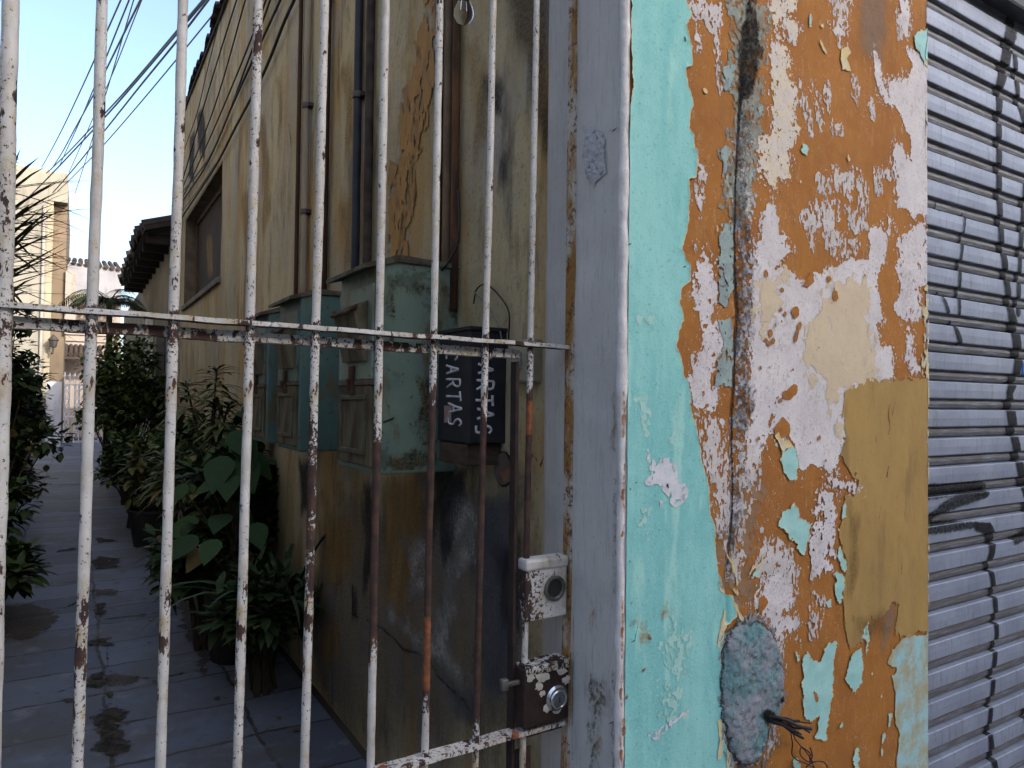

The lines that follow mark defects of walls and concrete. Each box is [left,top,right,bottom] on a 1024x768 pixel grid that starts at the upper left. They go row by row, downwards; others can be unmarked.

leakage [298,459,308,514]
leakage [316,466,523,741]
leakage [733,0,764,437]
peeling [611,0,930,768]